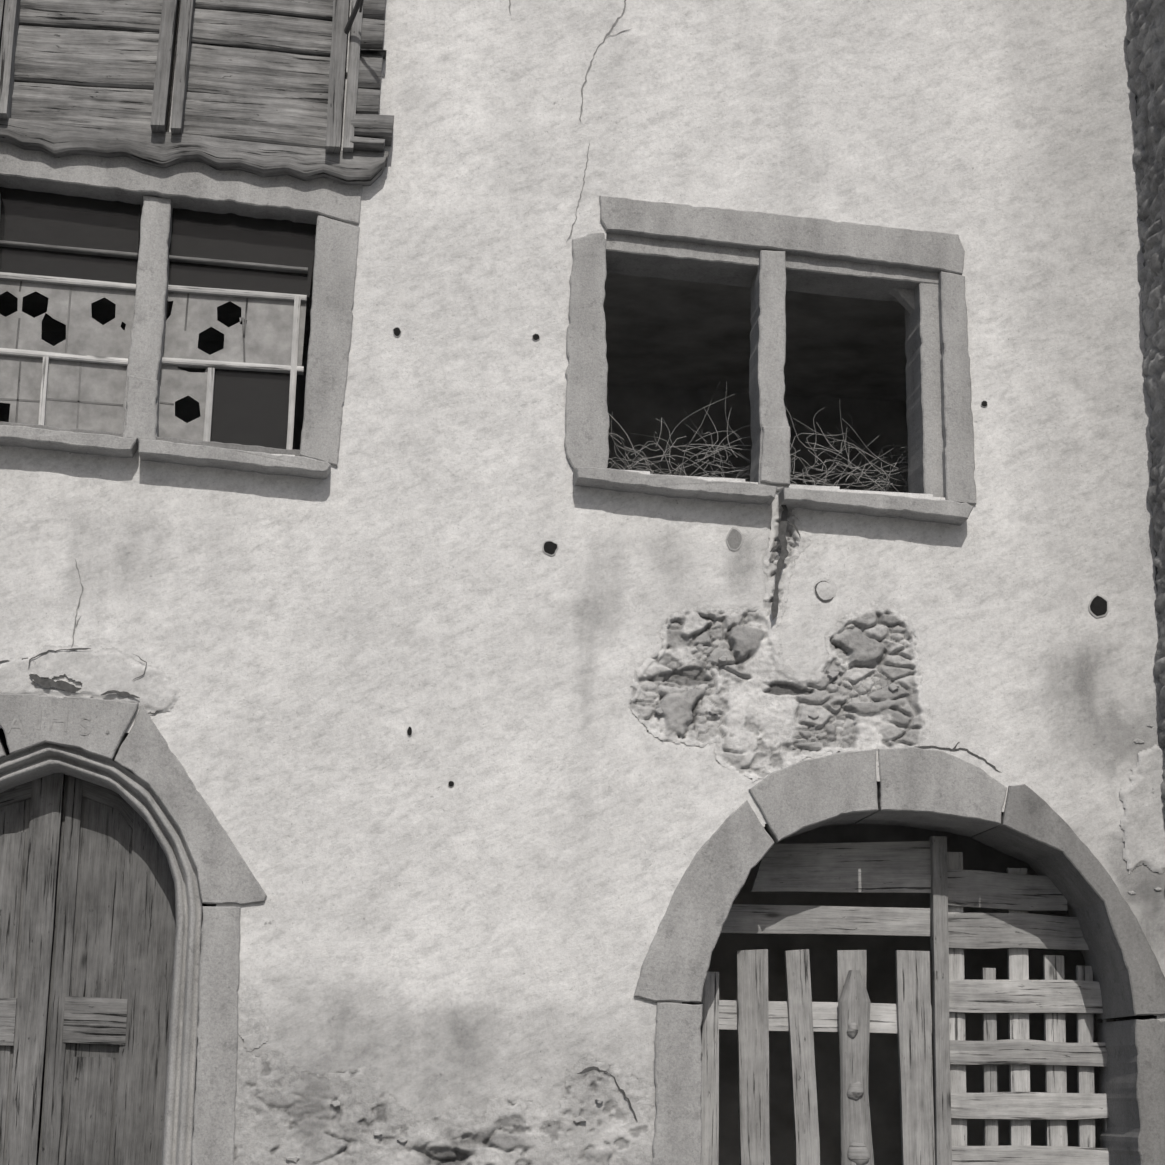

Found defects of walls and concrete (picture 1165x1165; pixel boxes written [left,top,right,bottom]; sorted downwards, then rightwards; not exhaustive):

crack [567,0,630,240]
crack [71,560,84,648]
flaking render [0,645,180,715]
flaking render [628,500,933,782]
flaking render [234,981,656,1165]